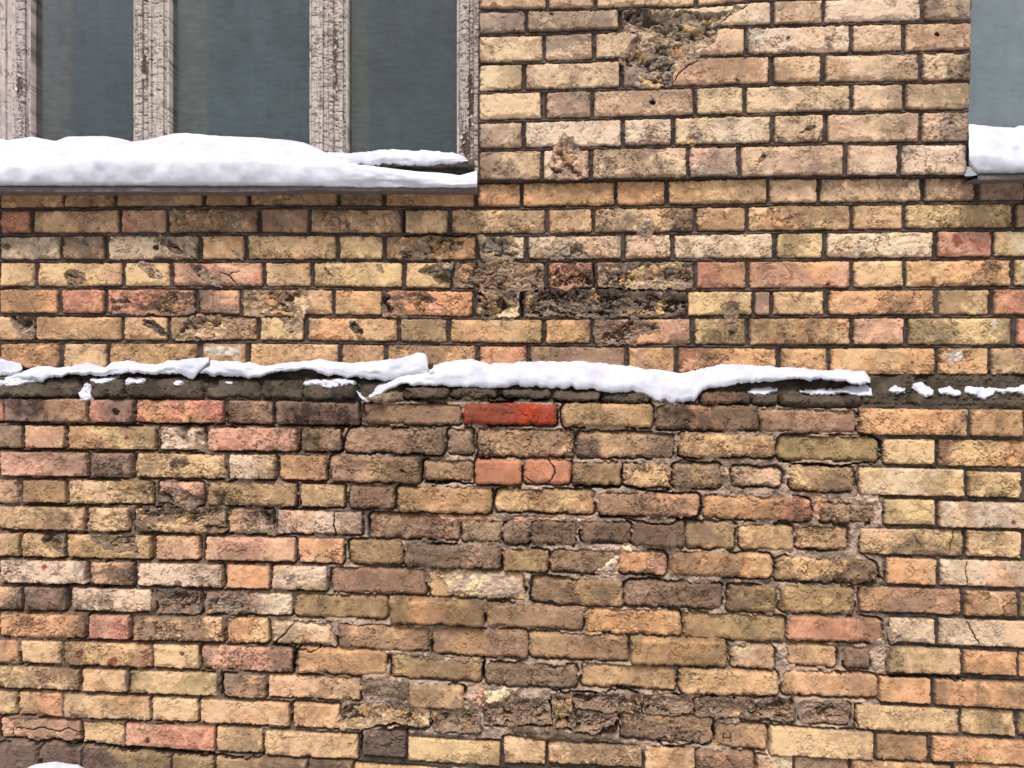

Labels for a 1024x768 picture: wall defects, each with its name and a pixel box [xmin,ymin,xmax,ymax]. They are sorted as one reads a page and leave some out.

spalling [619,5,742,90]
spalling [548,133,582,181]
spalling [382,234,694,347]
crack [525,459,703,526]
spalling [339,692,852,735]